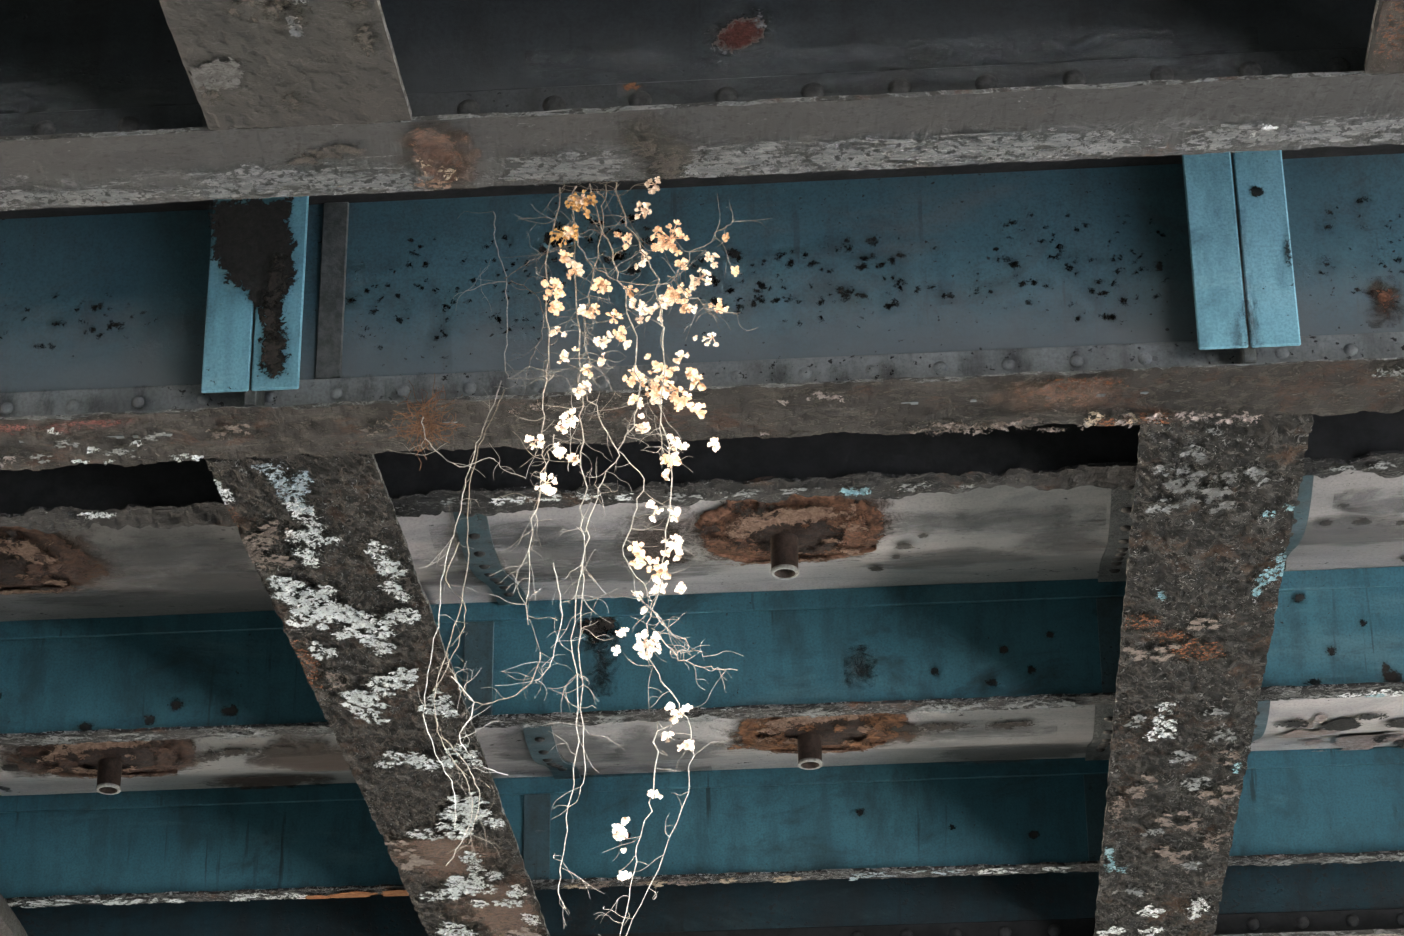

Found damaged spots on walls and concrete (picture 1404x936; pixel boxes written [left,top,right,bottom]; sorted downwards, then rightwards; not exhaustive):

corrosion [710,9,767,65]
corrosion [403,122,481,190]
corrosion [1367,279,1399,328]
peeling [491,492,633,505]
peeling [664,488,807,502]
peeling [206,704,277,740]
peeling [521,720,571,728]
peeling [663,712,721,723]
peeling [788,708,850,718]
peeling [904,703,983,714]
peeling [1002,699,1085,709]
peeling [0,698,183,792]